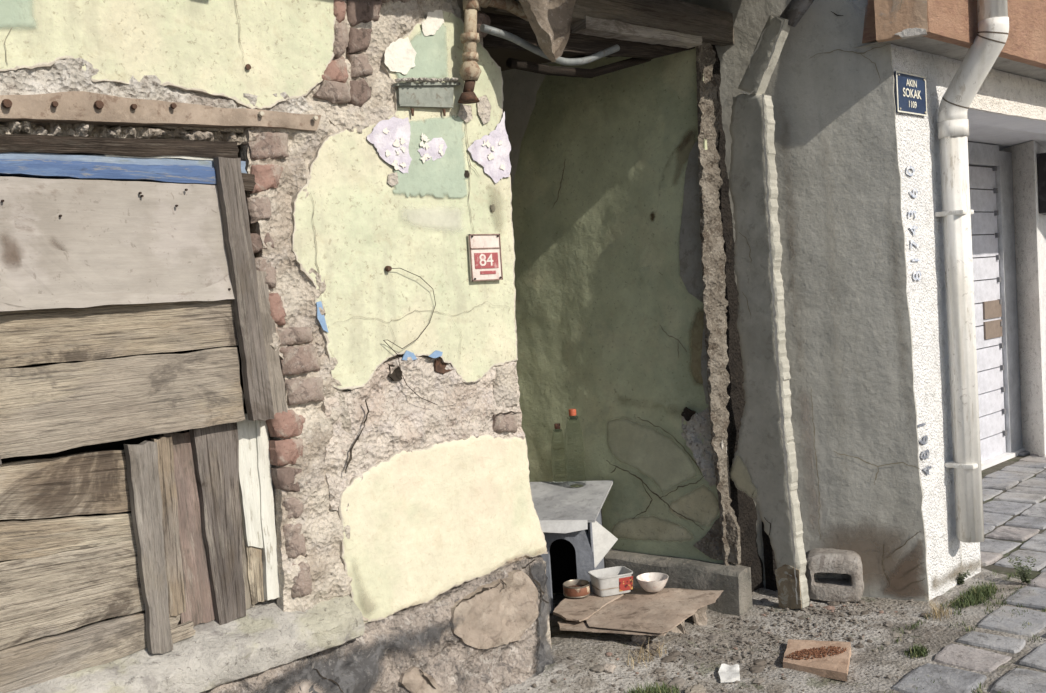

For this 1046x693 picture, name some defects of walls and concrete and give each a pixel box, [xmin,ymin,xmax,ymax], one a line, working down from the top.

spalling [0,0,525,612]
spalling [678,42,764,592]
crack [345,399,370,474]
crack [810,387,920,541]
crack [882,531,925,590]